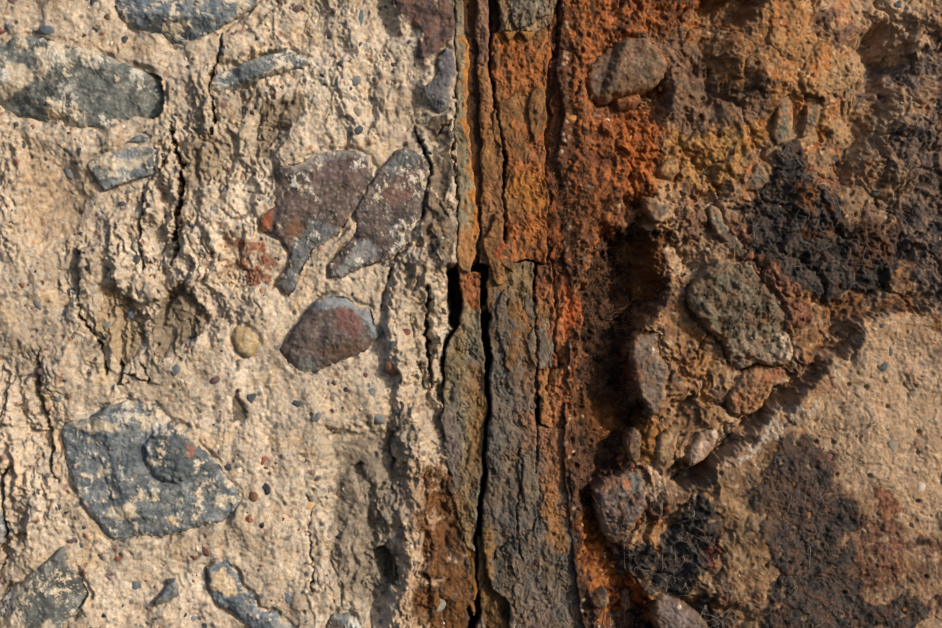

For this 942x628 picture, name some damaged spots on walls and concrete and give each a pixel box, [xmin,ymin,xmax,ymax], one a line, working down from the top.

crack [208,34,223,135]
crack [157,130,187,256]
crack [415,132,457,188]
rust [391,0,942,628]
efflorescence [725,398,820,466]